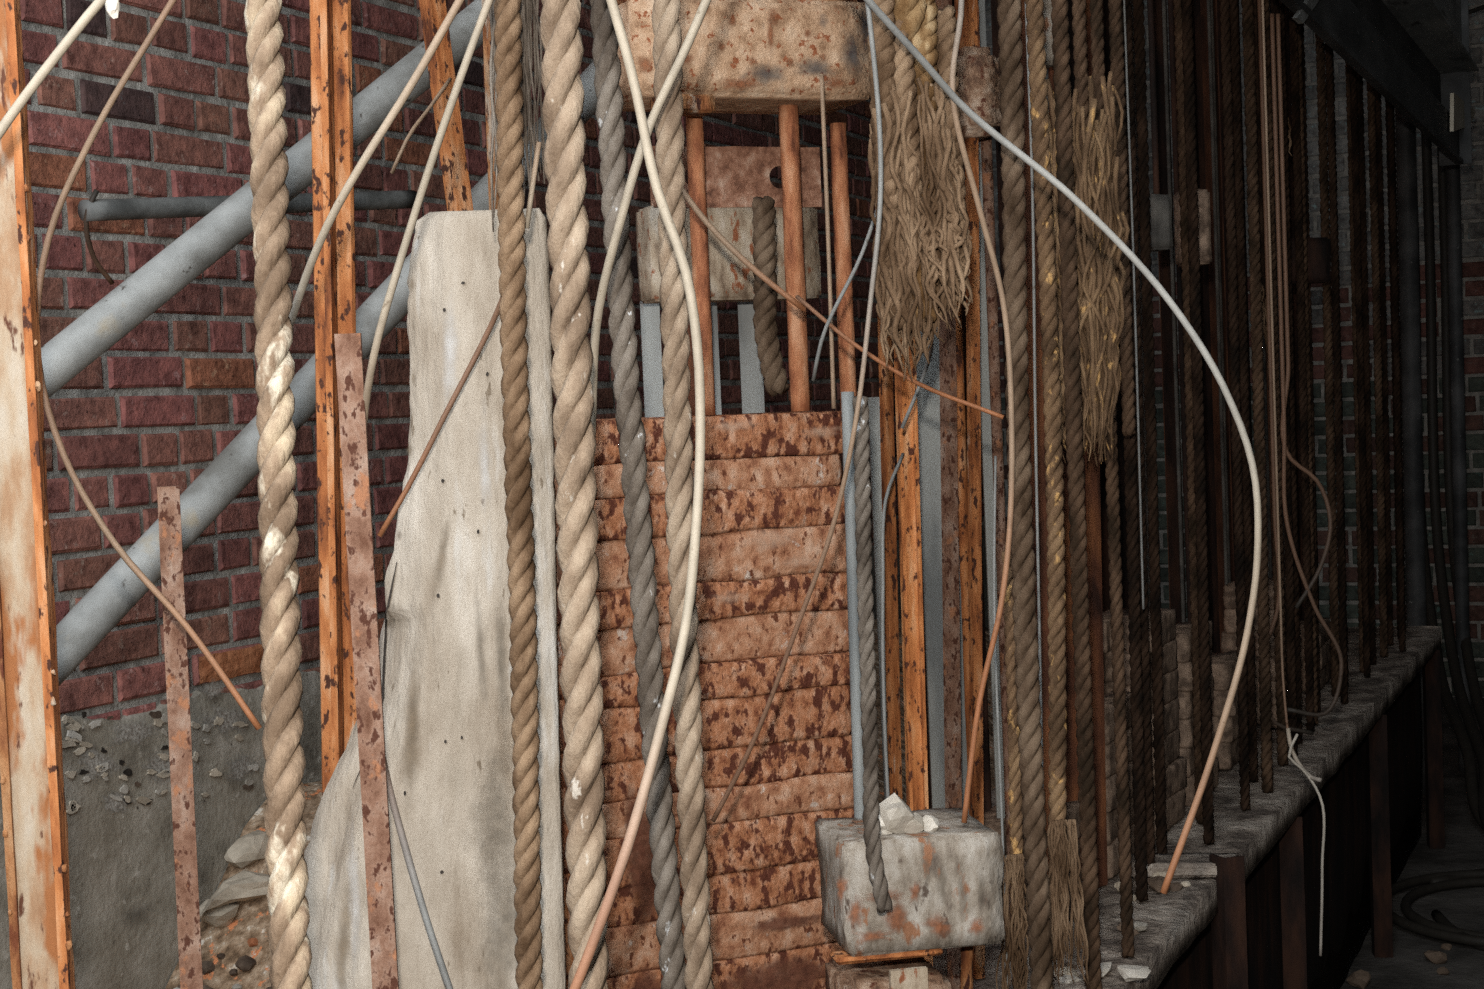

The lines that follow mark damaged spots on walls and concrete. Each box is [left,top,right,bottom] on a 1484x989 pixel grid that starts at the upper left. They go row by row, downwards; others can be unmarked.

corrosion [768,11,777,45]
corrosion [682,59,757,116]
corrosion [626,796,656,923]
corrosion [721,881,947,989]
corrosion [632,971,661,989]